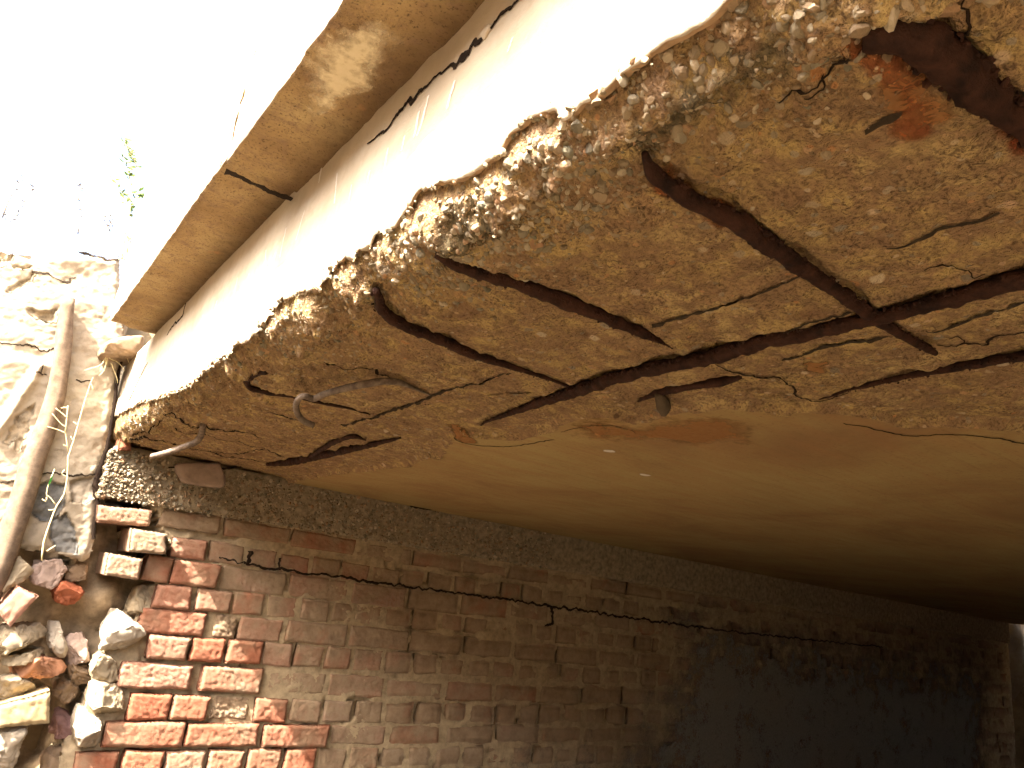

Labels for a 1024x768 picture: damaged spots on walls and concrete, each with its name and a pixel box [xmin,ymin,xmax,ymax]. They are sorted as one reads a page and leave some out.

crack [219,0,293,201]
leakage [319,30,380,106]
crack [367,0,519,144]
corrosion [841,38,953,140]
spalling [110,0,1024,483]
spalling [97,335,145,366]
crack [843,423,1024,444]
crack [219,551,883,648]